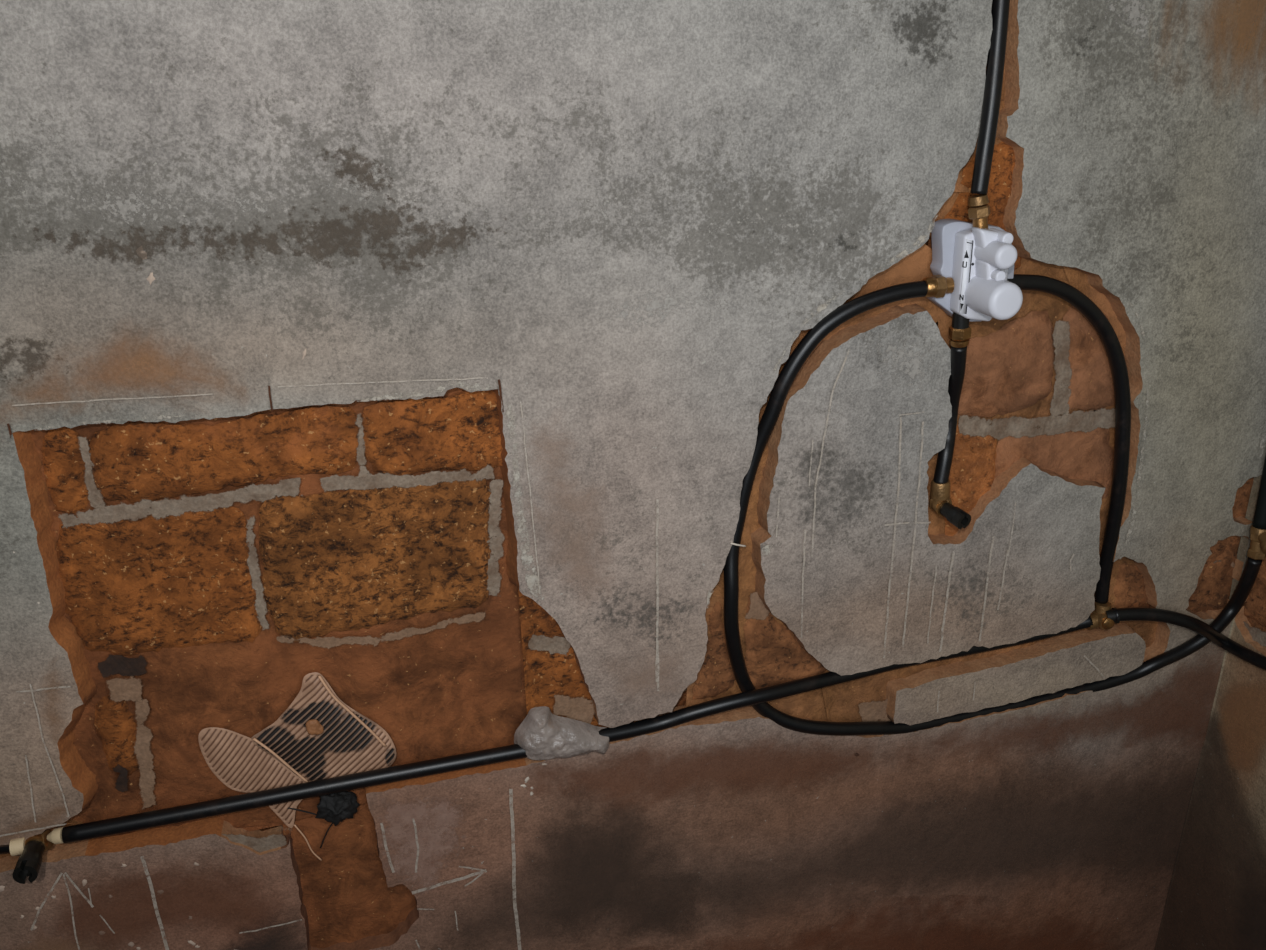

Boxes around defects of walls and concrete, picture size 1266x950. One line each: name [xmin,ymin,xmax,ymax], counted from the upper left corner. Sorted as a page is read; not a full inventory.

leakage [34,148,497,281]
flaking render [891,0,1170,662]
spalling [751,304,952,666]
flaking render [13,381,606,823]
spalling [885,622,1136,723]
flaking render [1186,477,1266,656]
leakage [0,684,70,837]
leakage [30,872,115,950]
flaking render [42,796,419,950]
leakage [412,866,487,894]
leakage [509,789,522,950]
leakage [1017,668,1266,950]